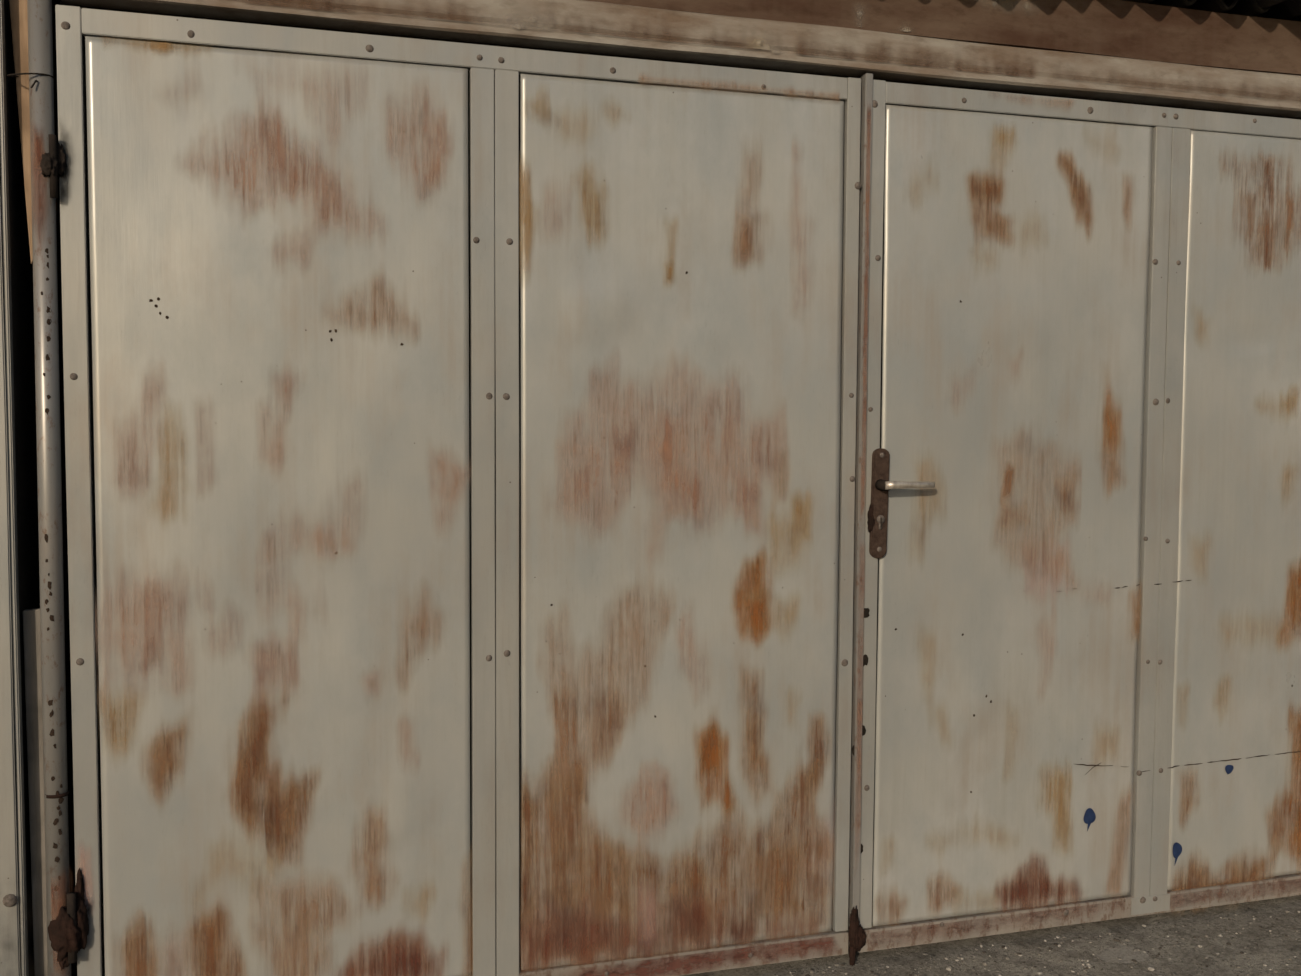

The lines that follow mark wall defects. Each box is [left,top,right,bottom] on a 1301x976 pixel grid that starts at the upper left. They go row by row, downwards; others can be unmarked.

corrosion [191,120,347,222]
corrosion [971,178,1005,234]
corrosion [1060,157,1090,228]
corrosion [1240,162,1298,267]
corrosion [735,525,777,642]
corrosion [1280,569,1301,644]
corrosion [231,698,316,860]
corrosion [521,612,834,976]
corrosion [1173,716,1301,904]
corrosion [125,926,154,976]
corrosion [194,909,242,976]
corrosion [344,934,435,976]